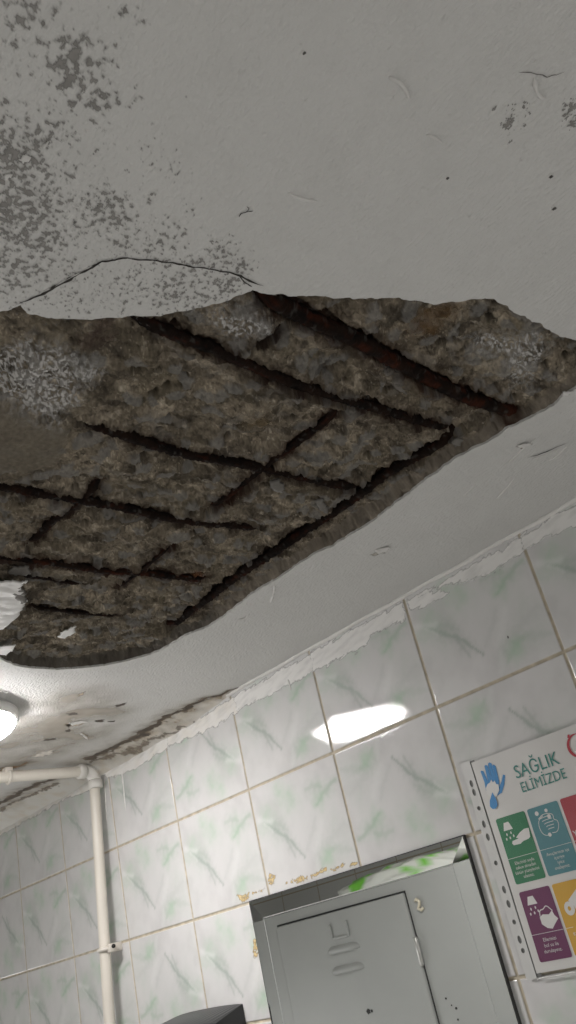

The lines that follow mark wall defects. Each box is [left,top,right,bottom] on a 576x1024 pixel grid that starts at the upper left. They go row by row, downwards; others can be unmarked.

crack [16,257,263,305]
spalling [0,0,576,668]
rust [252,290,518,417]
rust [0,315,455,626]
water stain [82,688,237,763]
water stain [0,779,60,812]